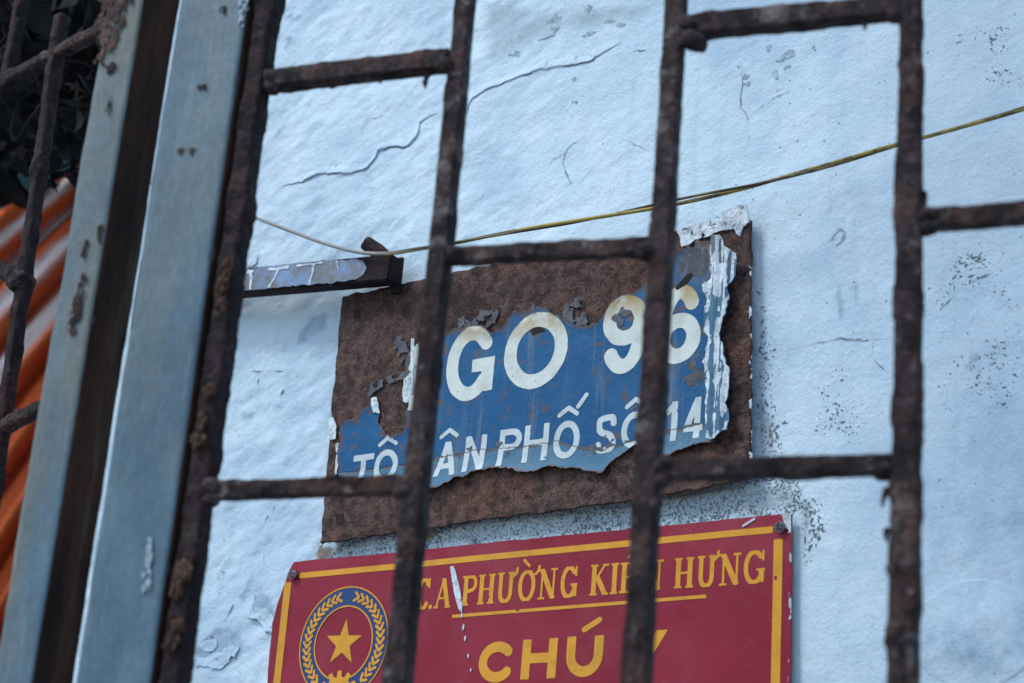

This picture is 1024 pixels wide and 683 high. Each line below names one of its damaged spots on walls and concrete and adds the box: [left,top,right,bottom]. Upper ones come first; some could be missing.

crack [467,35,644,111]
crack [282,107,438,187]
crack [549,140,578,185]
peeling [252,596,274,629]
peeling [195,630,239,669]